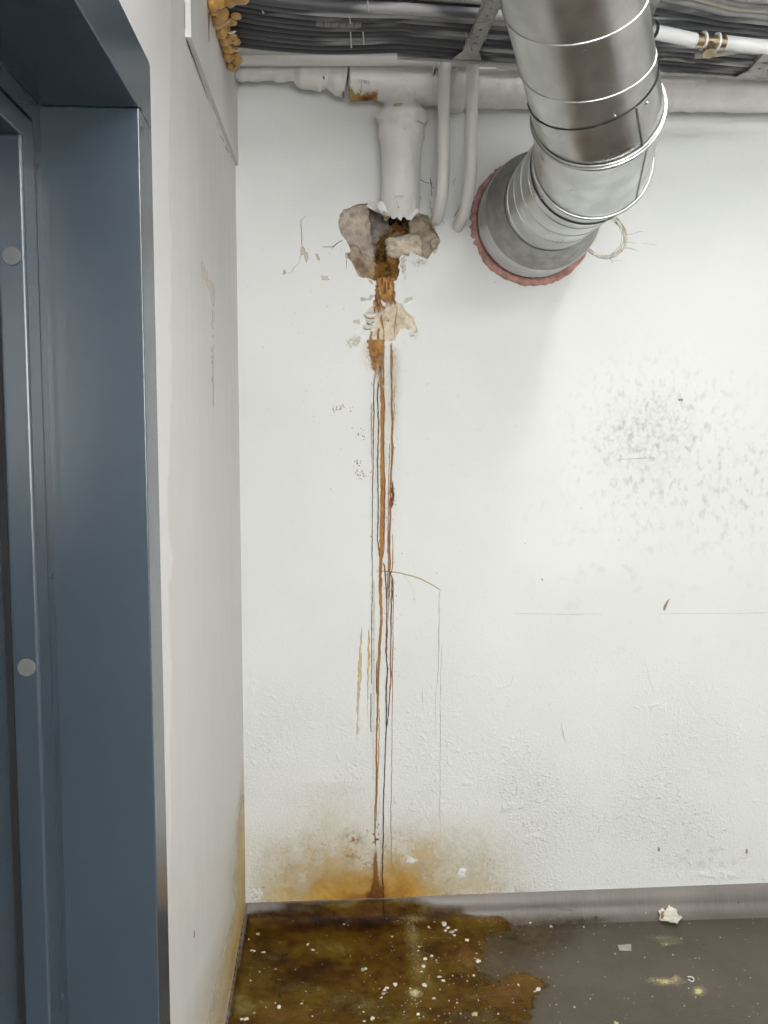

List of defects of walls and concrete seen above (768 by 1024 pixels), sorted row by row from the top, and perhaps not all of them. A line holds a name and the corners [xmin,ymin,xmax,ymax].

corrosion [374,277,396,313]
spalling [338,200,440,346]
corrosion [226,340,548,1024]
damp [263,838,446,902]